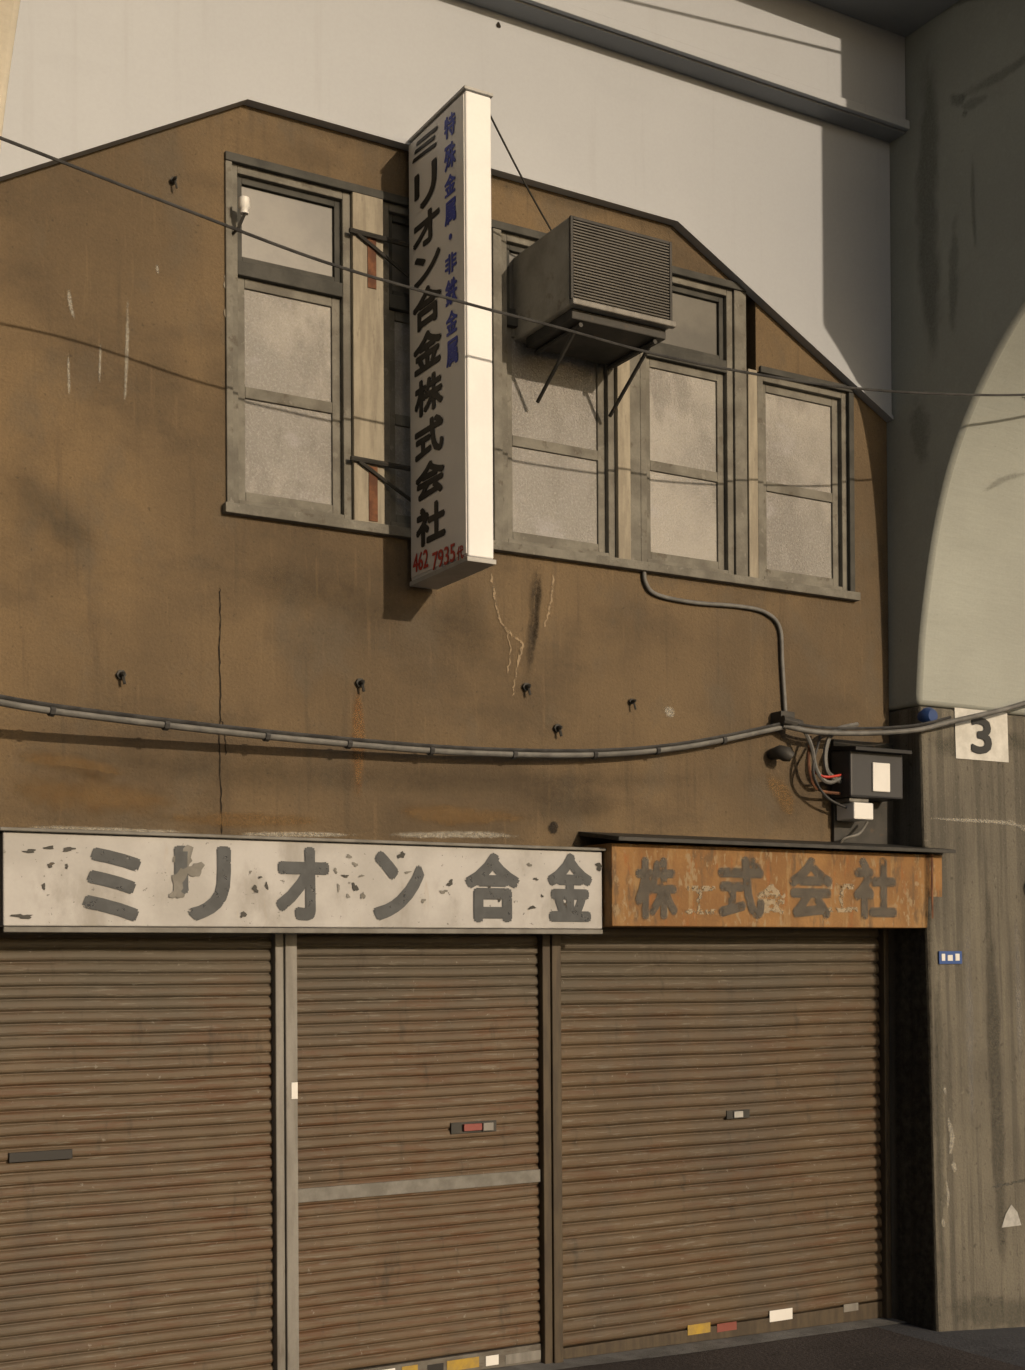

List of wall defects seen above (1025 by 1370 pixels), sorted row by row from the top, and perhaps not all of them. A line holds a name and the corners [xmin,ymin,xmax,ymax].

crack [218,589,227,833]
crack [490,573,555,696]